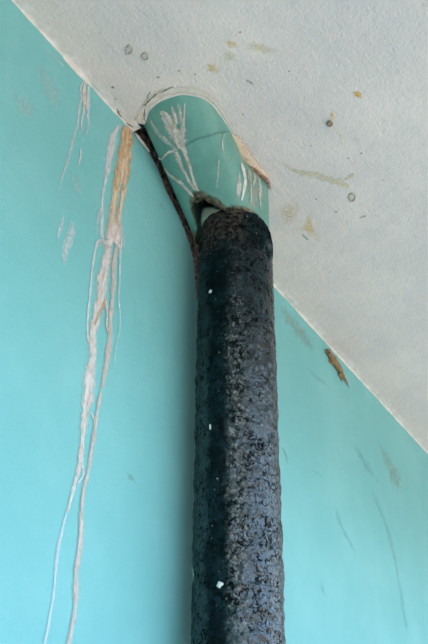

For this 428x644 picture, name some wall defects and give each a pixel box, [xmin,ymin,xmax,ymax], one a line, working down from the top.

leakage [75,81,90,133]
flaking render [136,87,271,190]
leakage [236,163,262,208]
rust [44,124,133,644]